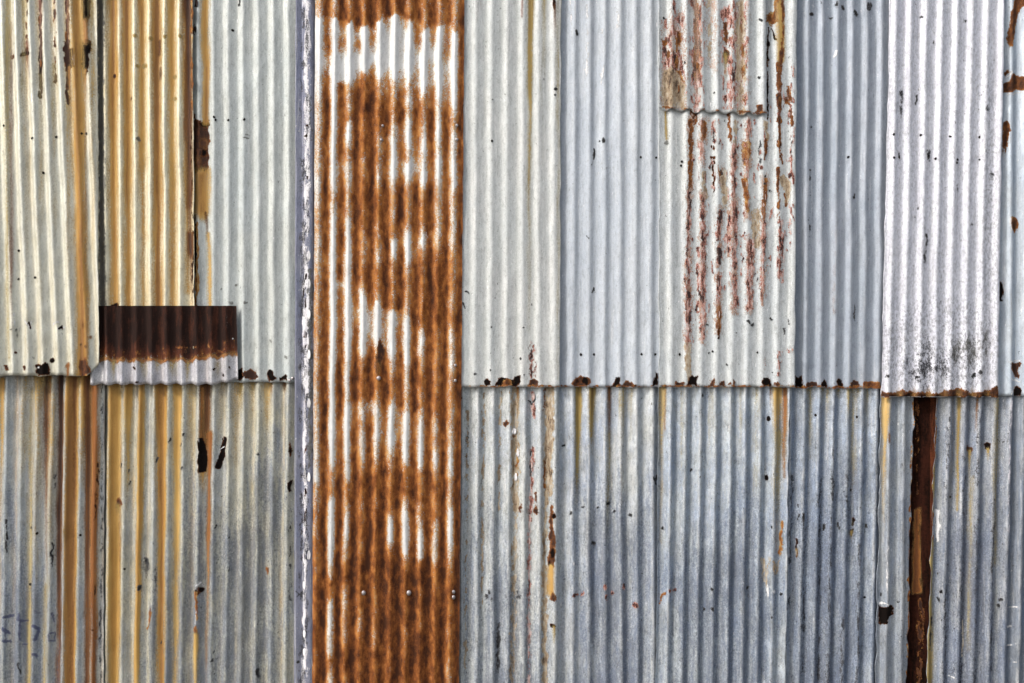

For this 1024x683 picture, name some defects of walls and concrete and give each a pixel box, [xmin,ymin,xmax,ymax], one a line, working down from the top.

rust [4,0,271,683]
rust [312,0,506,683]
rust [658,0,794,284]
rust [1002,120,1011,152]
rust [1003,70,1024,95]
rust [1009,217,1019,233]
rust [1006,0,1024,47]
rust [523,348,999,683]